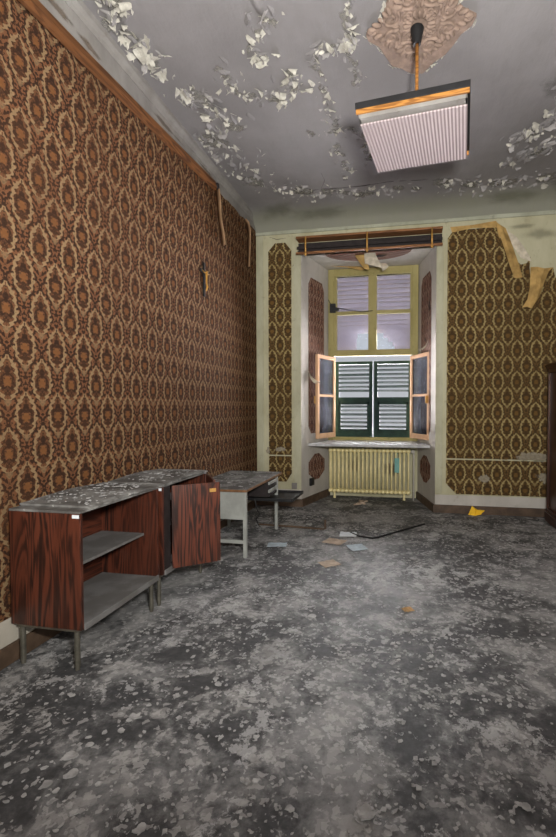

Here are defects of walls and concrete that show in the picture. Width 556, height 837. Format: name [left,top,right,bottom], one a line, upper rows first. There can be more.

peeling [95,0,175,83]
peeling [175,0,420,202]
peeling [433,85,556,198]